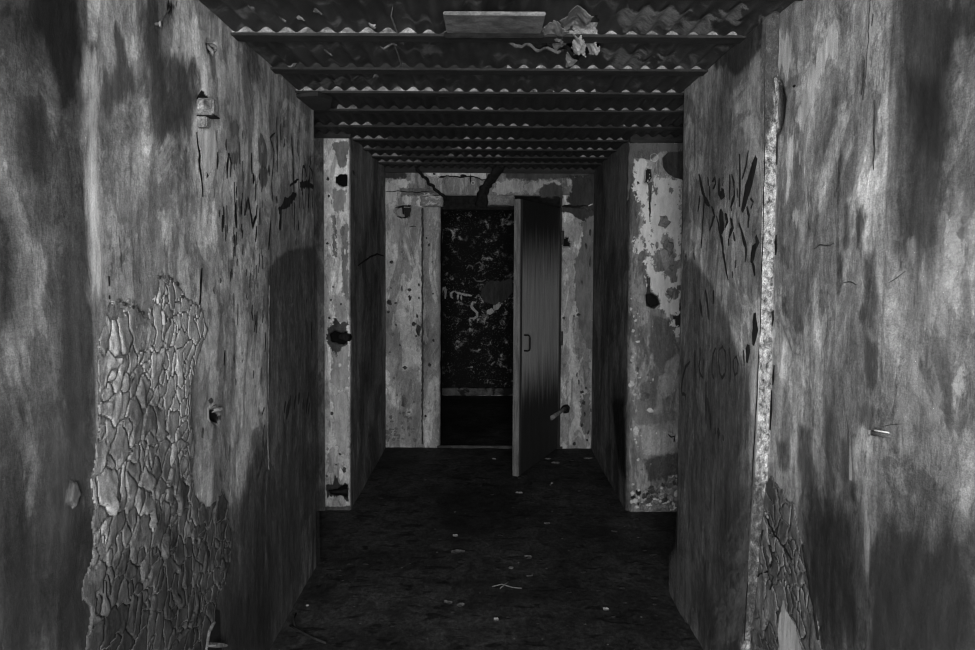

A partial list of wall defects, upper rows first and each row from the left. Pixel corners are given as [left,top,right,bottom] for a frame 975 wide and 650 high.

crack [196,268,204,305]
peeling [326,140,352,501]
peeling [628,158,682,470]